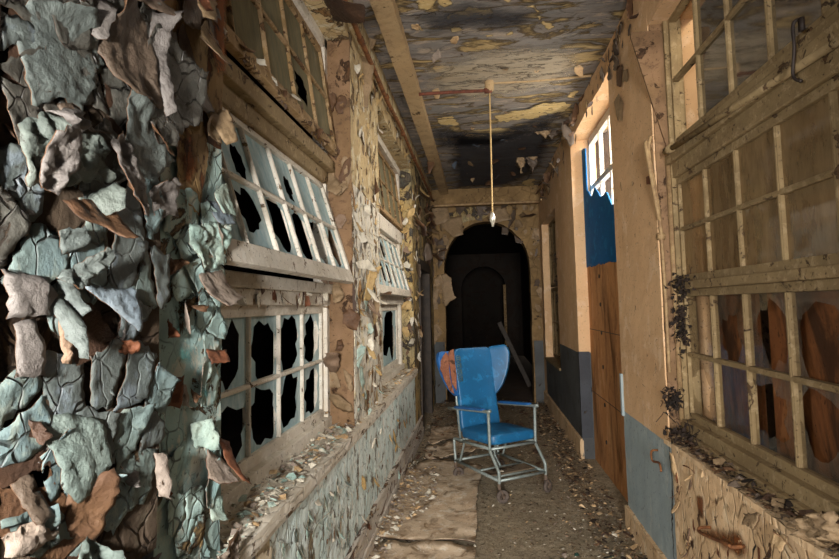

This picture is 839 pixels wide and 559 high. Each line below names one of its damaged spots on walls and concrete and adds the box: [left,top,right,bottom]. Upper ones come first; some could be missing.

peeling [0,0,418,559]